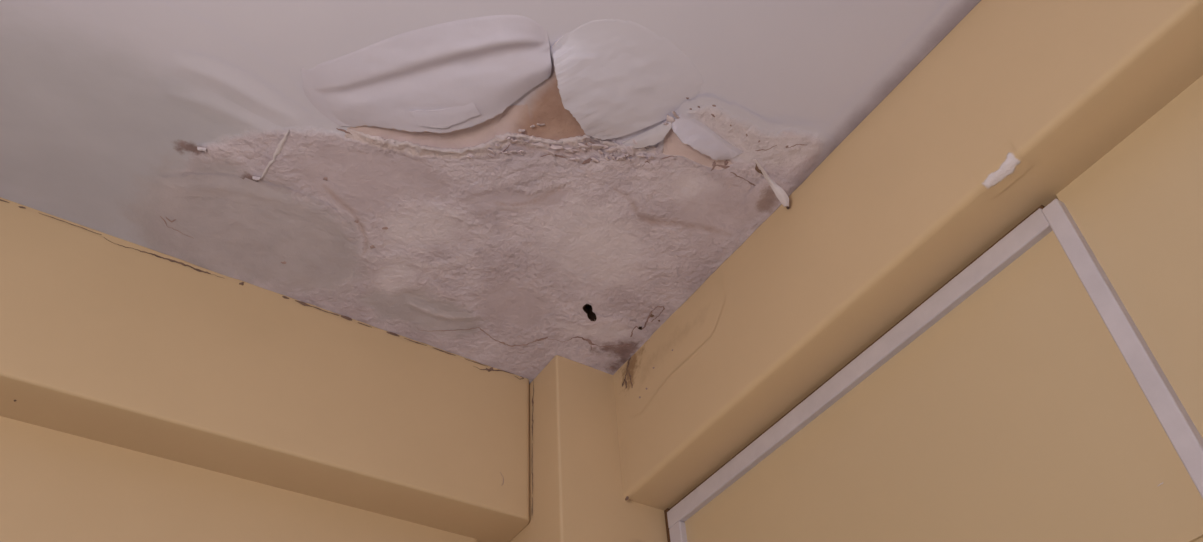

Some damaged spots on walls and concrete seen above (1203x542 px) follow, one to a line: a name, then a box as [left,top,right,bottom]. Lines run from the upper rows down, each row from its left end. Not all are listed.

peeling [161,123,288,164]
flaking render [344,107,733,181]
leakage [0,0,792,417]
crack [282,296,631,367]
flaking render [429,336,601,380]
flaking render [595,259,724,337]